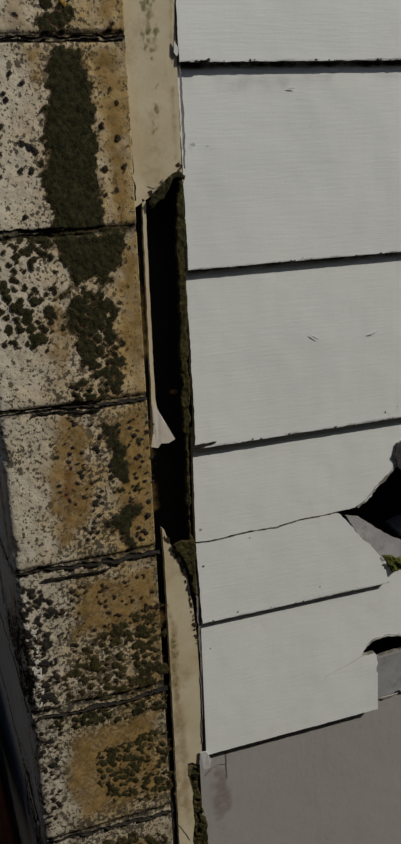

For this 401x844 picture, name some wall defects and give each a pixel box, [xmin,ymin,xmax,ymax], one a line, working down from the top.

peeling [151,401,175,448]
damp [118,414,153,533]
crack [191,510,347,543]
damp [74,572,158,637]
damp [3,588,47,719]
damp [68,717,157,814]